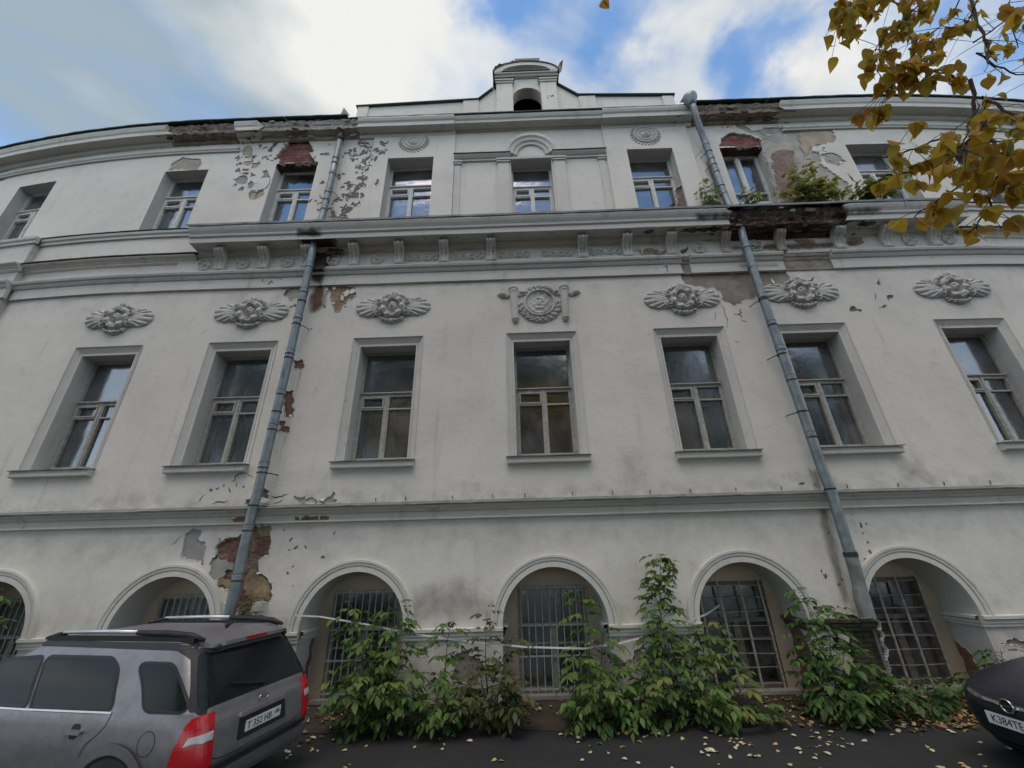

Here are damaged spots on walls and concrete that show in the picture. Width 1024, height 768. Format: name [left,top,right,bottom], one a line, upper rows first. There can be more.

spalling [156,119,388,219]
spalling [673,102,876,306]
spalling [317,286,357,313]
spalling [277,390,296,434]
spalling [180,483,307,615]